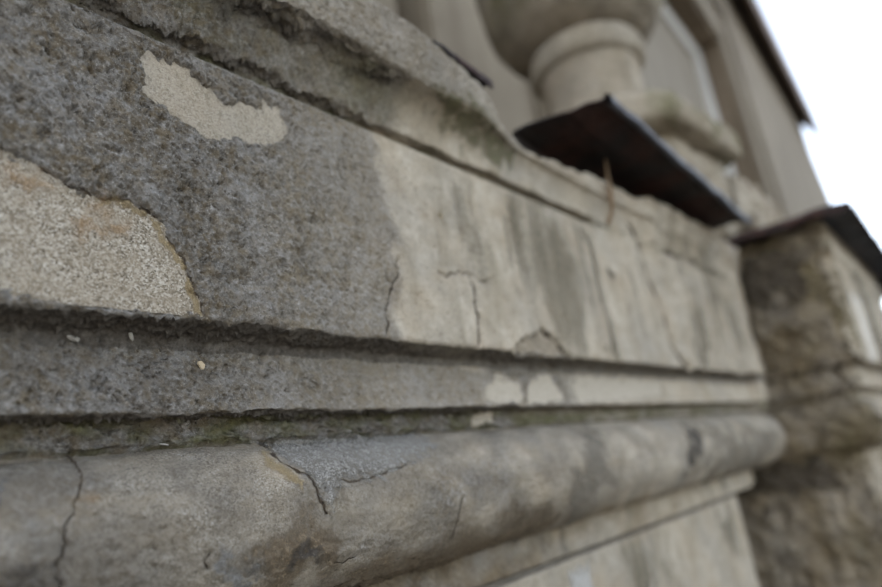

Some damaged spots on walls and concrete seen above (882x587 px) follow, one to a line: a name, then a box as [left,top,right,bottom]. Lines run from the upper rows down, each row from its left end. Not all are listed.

spalling [140,50,288,146]
spalling [0,150,203,318]
crack [437,272,492,347]
crack [663,249,725,277]
crack [55,455,84,587]
crack [339,465,405,483]